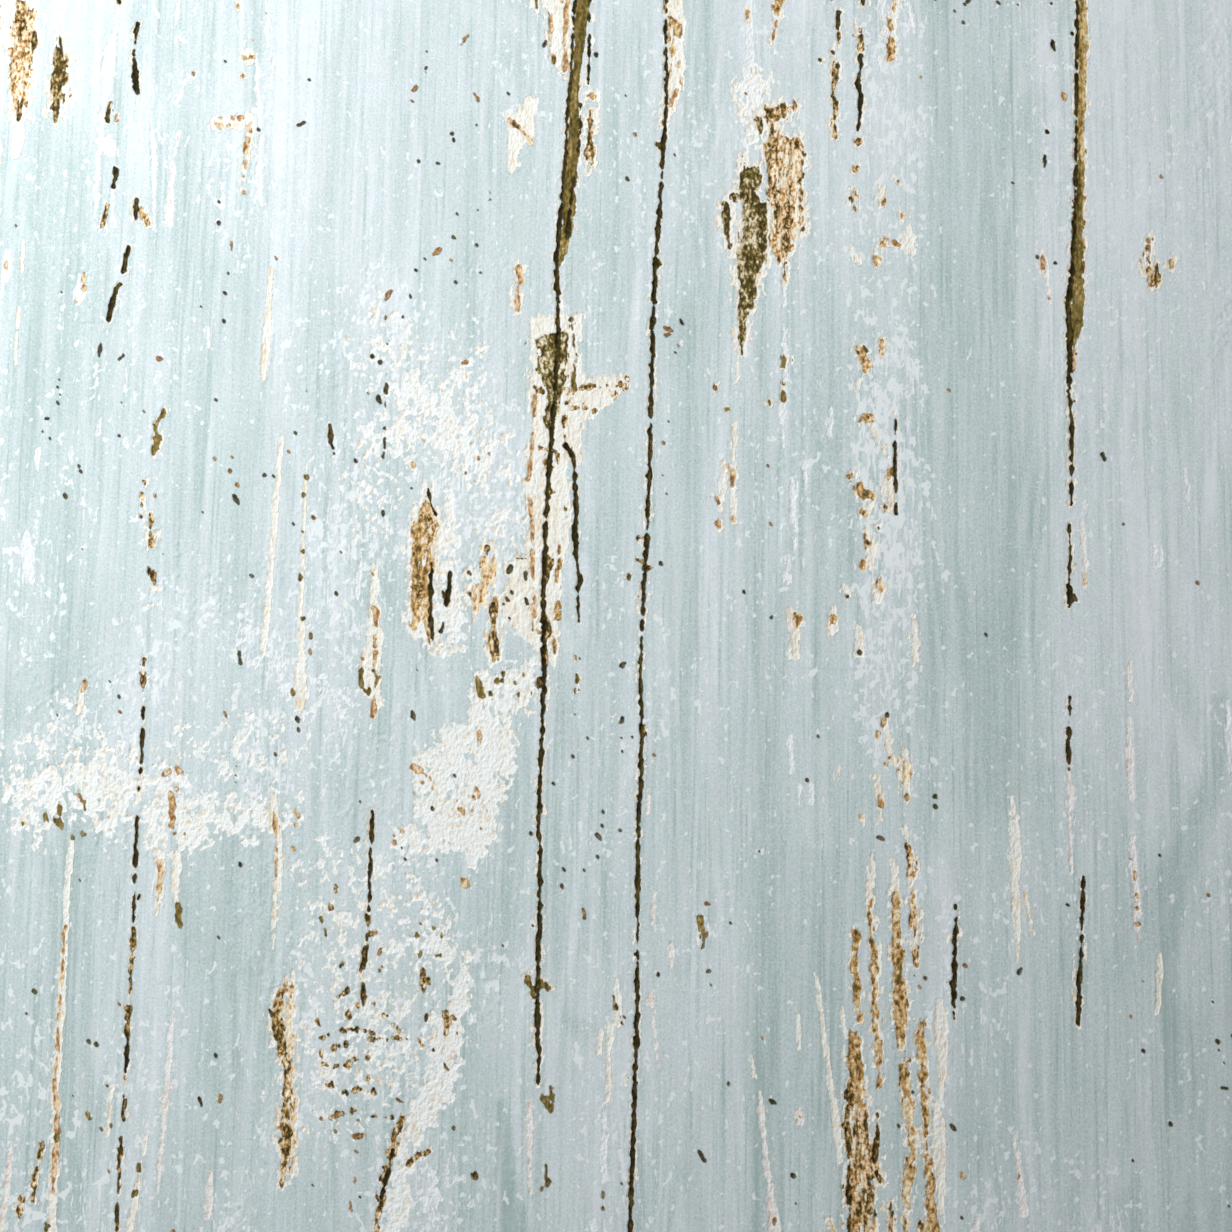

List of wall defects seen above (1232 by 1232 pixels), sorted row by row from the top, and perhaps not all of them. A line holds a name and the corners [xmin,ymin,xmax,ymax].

peeling [210,111,260,194]
peeling [0,257,630,1232]
peeling [502,91,539,174]
peeling [529,0,571,80]
crack [521,0,596,1089]
peeling [581,87,601,177]
crack [623,0,670,1232]
peeling [712,0,812,393]
peeling [763,354,794,408]
peeling [858,712,915,840]
crack [994,0,1092,610]
peeling [822,823,945,1232]